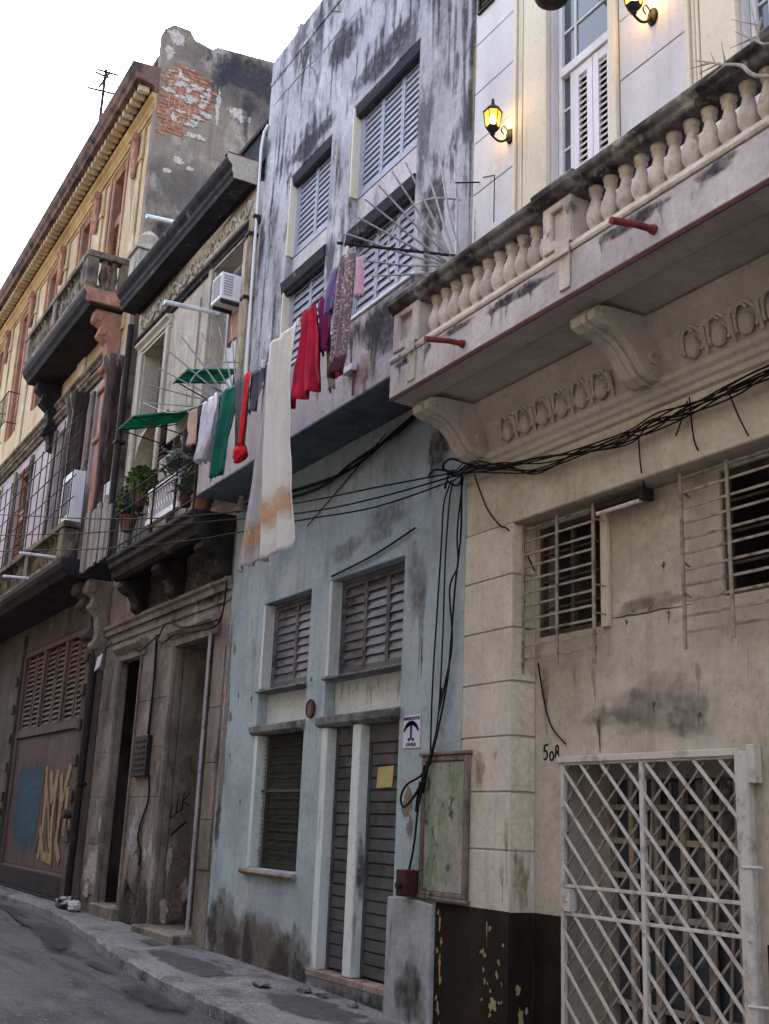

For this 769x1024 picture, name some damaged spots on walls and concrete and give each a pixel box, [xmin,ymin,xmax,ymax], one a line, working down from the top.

flaking render [156,45,251,141]
leakage [207,56,273,133]
leakage [300,36,312,101]
leakage [329,0,477,225]
leakage [270,108,332,224]
leakage [697,153,734,180]
leakage [421,180,444,272]
leakage [599,197,670,246]
leakage [207,893,382,1010]
leakage [395,968,421,1021]
peeling [480,922,502,1017]
peeling [515,985,528,1024]